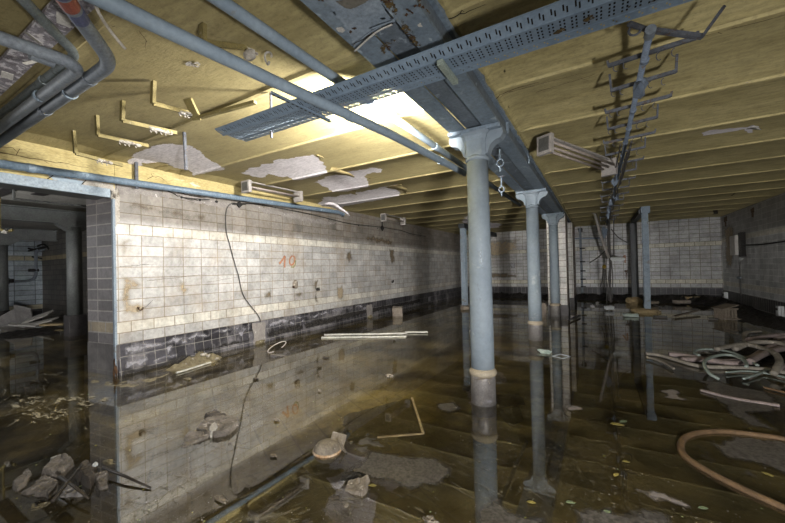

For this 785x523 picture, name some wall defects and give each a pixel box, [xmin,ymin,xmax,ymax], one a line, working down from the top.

corrosion [381,0,430,46]
peeling [702,125,761,136]
peeling [127,143,224,176]
peeling [242,155,407,216]